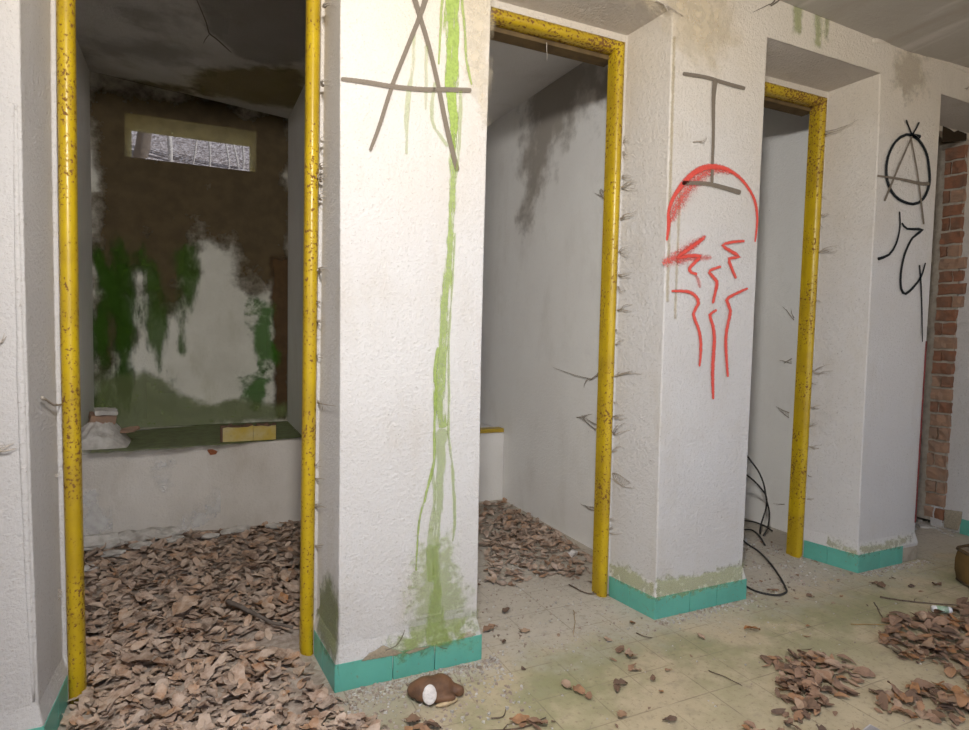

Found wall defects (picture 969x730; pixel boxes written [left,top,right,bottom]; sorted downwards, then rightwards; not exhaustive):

water stain [90,68,303,419]
water stain [415,0,472,571]
flaking render [916,126,969,530]